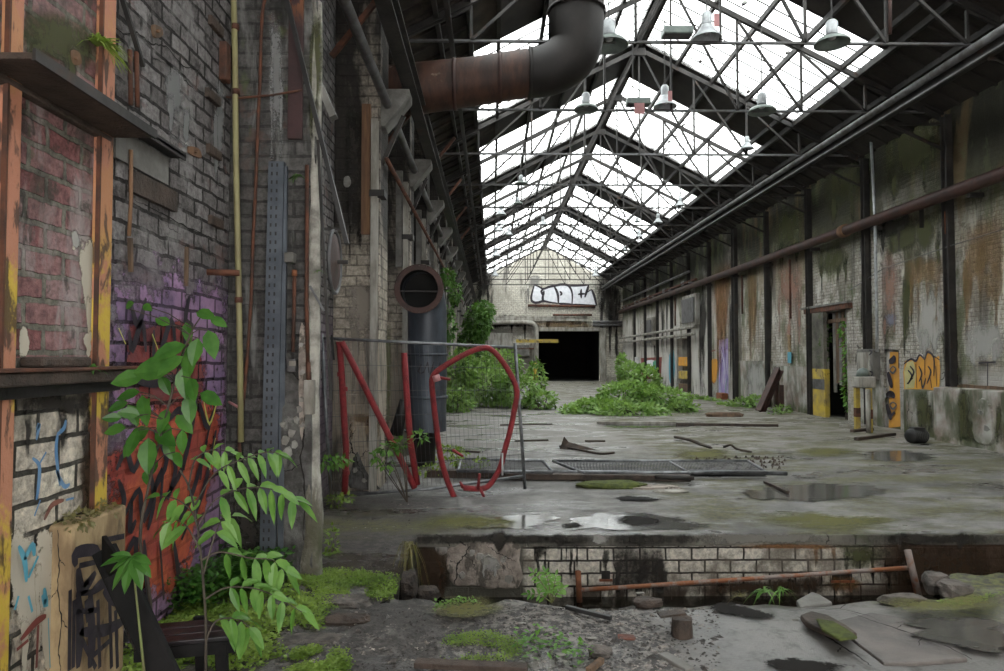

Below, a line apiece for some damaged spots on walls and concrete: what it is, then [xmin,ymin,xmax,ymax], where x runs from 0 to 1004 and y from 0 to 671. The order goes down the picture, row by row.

peeling [19,326,30,357]
peeling [71,231,93,357]
rust [715,268,729,380]
damp [878,214,912,278]
rust [963,219,1003,332]
crack [436,534,516,584]